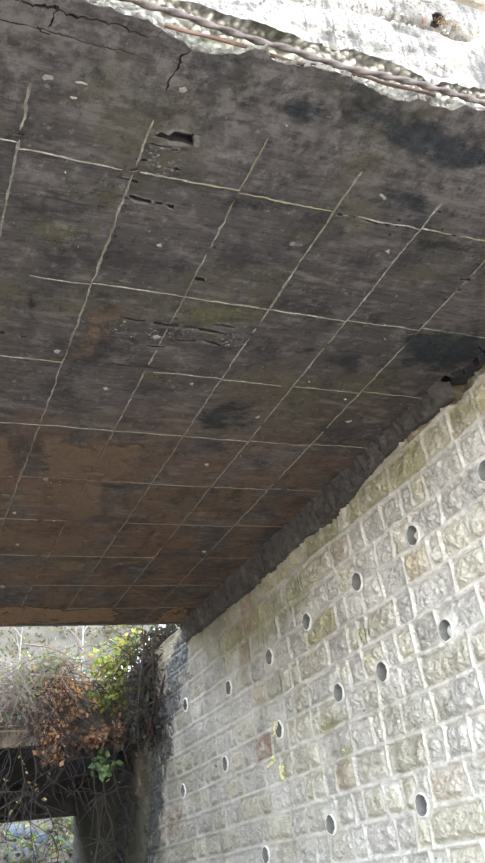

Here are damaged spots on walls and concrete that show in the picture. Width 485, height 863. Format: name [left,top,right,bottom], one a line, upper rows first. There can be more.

crack [0,0,190,92]
spalling [85,0,485,111]
damp [286,101,322,120]
spalling [149,130,194,151]
damp [369,111,485,168]
spalling [124,195,174,209]
damp [404,330,477,372]